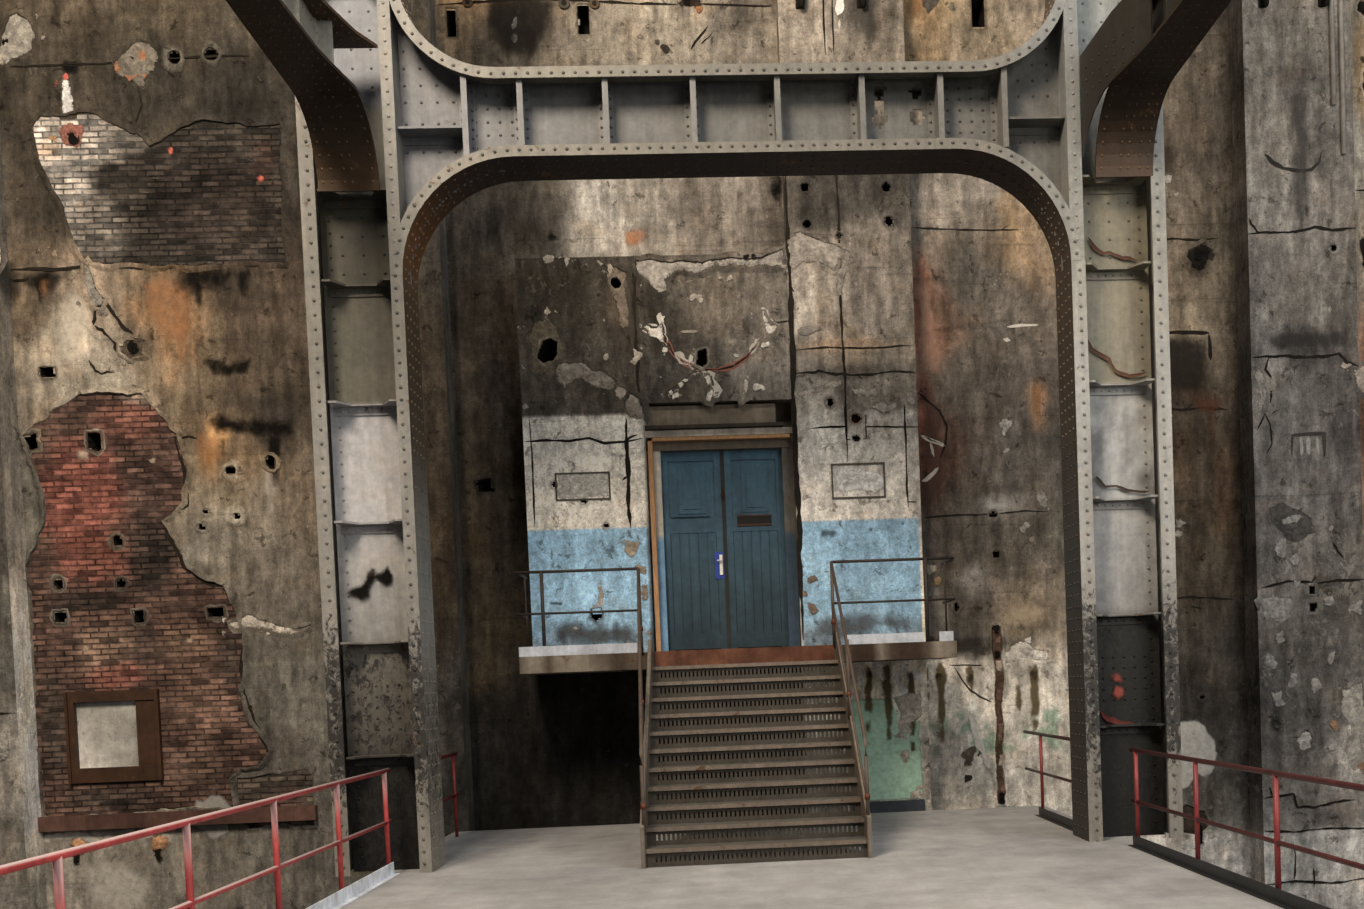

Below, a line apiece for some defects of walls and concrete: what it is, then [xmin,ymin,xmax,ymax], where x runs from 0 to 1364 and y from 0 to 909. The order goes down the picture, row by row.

flaking render [0,8,45,71]
water stain [489,0,550,53]
flaking render [27,72,292,316]
spalling [35,364,59,383]
crack [89,277,133,374]
flaking render [517,226,858,425]
flaking render [19,385,320,833]
flaking render [1254,497,1364,779]